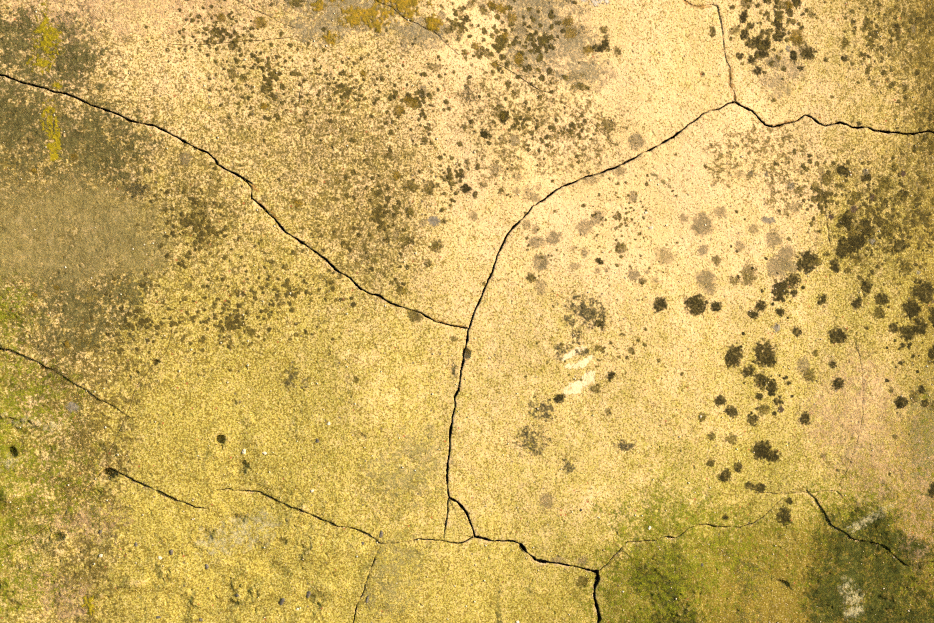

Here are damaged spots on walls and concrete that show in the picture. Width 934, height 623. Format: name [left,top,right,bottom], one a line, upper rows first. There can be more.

crack [175,0,297,45]
mould [730,0,819,81]
crack [646,0,934,152]
mould [841,0,934,103]
leakage [166,0,651,285]
mould [793,107,934,318]
leakage [13,143,356,623]
crack [0,74,724,623]
mould [752,360,794,403]
mould [887,323,924,373]
leakage [631,554,705,623]
leakage [802,508,934,623]